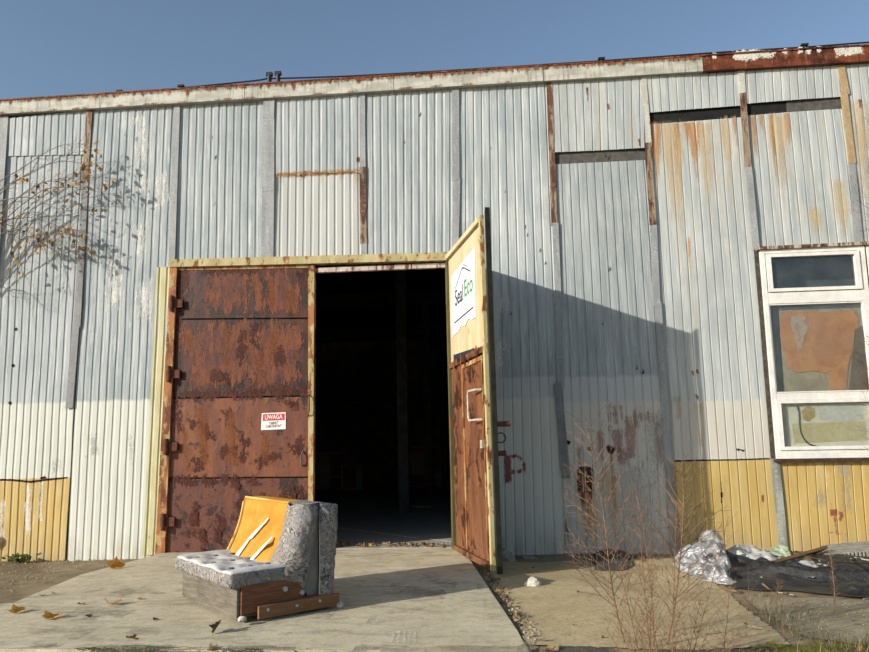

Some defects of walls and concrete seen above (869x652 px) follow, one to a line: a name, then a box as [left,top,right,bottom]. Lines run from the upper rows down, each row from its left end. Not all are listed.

peeling [733,46,823,62]
peeling [835,46,864,57]
rust [276,157,360,179]
rust [651,122,709,210]
rust [751,113,790,171]
rust [172,269,308,411]
rust [169,473,258,488]
rust [577,455,617,531]